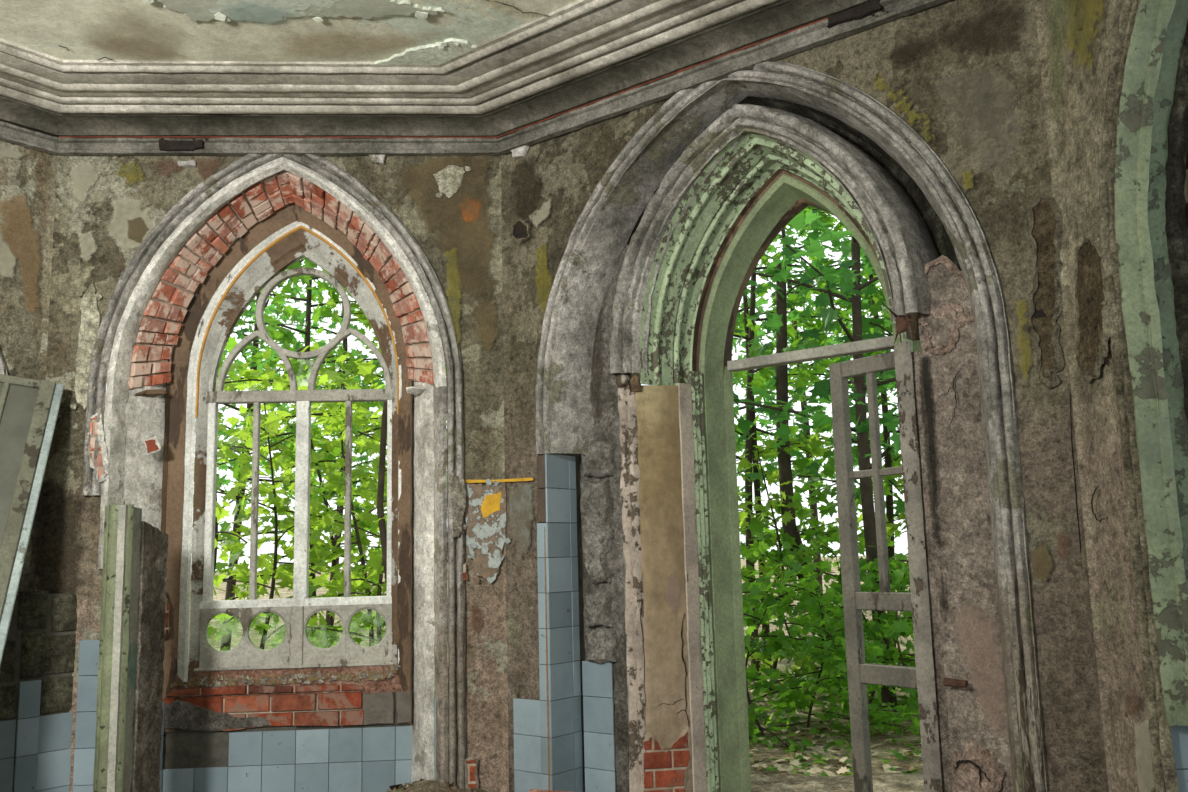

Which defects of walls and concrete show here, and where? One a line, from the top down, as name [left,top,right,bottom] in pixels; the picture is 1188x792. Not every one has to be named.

peeling [140,0,445,23]
crack [487,0,550,17]
peeling [375,38,476,66]
spalling [177,160,197,168]
peeling [109,195,156,252]
flaking render [0,195,41,311]
peeling [79,232,96,261]
flaking render [128,170,434,389]
peeling [457,479,533,584]
flaking render [0,591,77,720]
crack [955,760,990,787]